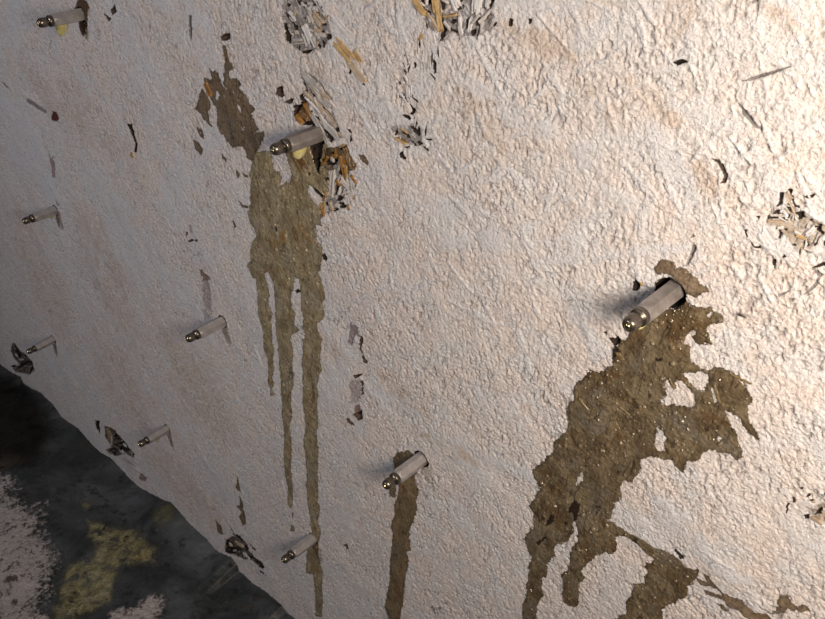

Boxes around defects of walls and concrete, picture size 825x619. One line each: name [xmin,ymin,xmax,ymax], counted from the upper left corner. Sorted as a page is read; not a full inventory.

spalling [283,0,355,54]
peeling [416,0,497,80]
spalling [293,69,357,217]
spalling [744,188,825,268]
spalling [11,343,34,375]
spalling [95,420,147,481]
spalling [786,487,825,525]
spalling [225,526,264,574]